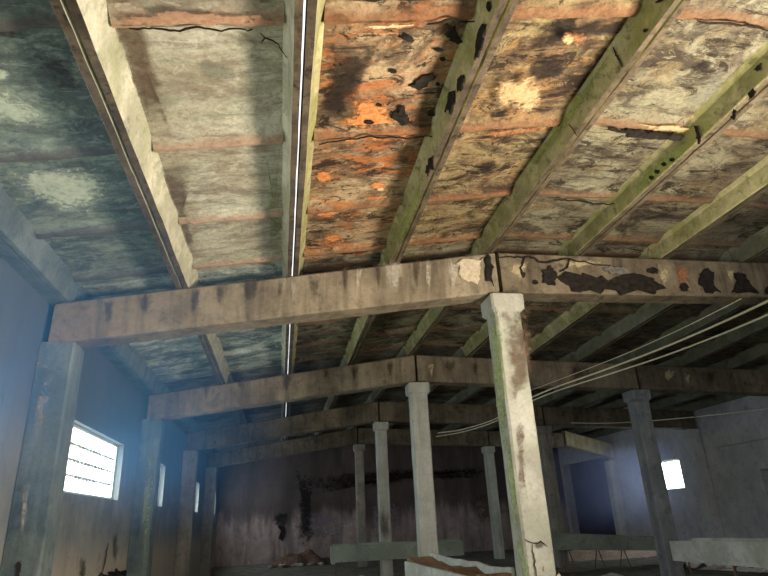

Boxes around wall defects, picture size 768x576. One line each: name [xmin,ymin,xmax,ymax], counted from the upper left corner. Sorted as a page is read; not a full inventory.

efflorescence [0,92,46,122]
rust [342,100,414,140]
peeling [444,74,465,115]
water stain [10,169,105,211]
rust [315,172,332,182]
rust [368,182,389,199]
spalling [456,254,494,287]
crack [499,256,611,278]
peeling [522,265,666,296]
water stain [510,317,530,388]
crack [99,546,123,576]
crack [525,539,546,576]